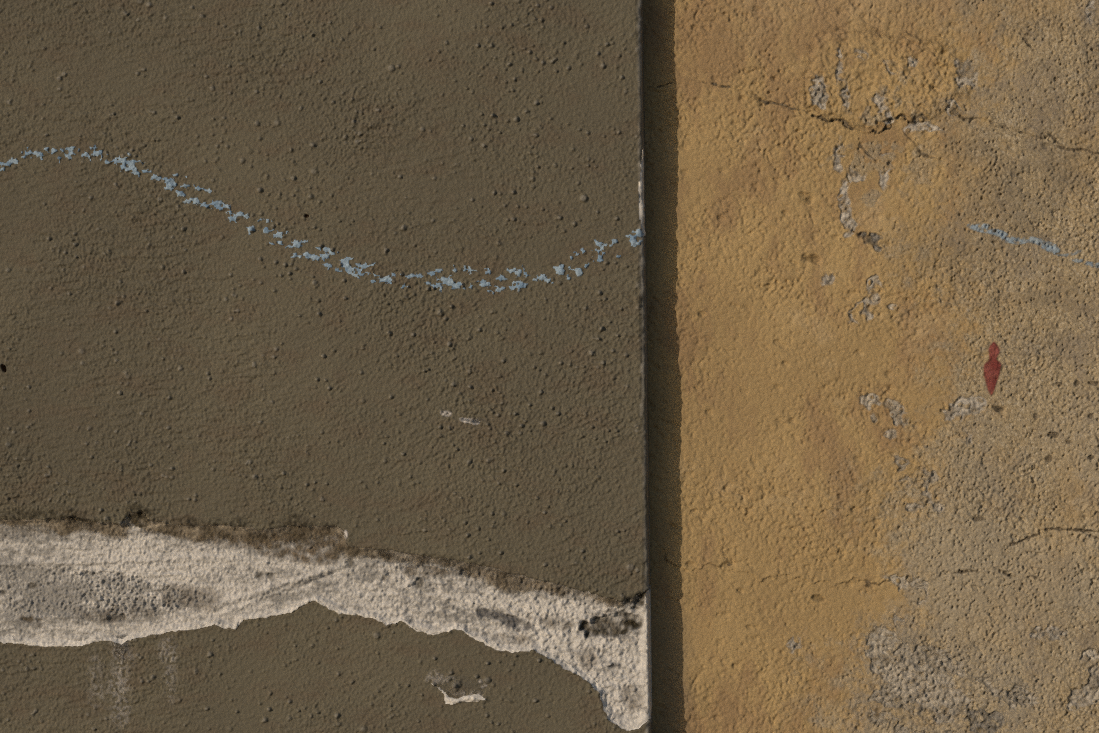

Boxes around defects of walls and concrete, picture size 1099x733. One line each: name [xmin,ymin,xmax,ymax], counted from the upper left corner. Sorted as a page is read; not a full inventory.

peeling [810,49,850,109]
crack [703,82,1099,161]
peeling [872,93,941,132]
peeling [834,145,881,252]
crack [1003,527,1099,581]
flaking render [0,511,652,731]
peeling [865,614,1039,733]